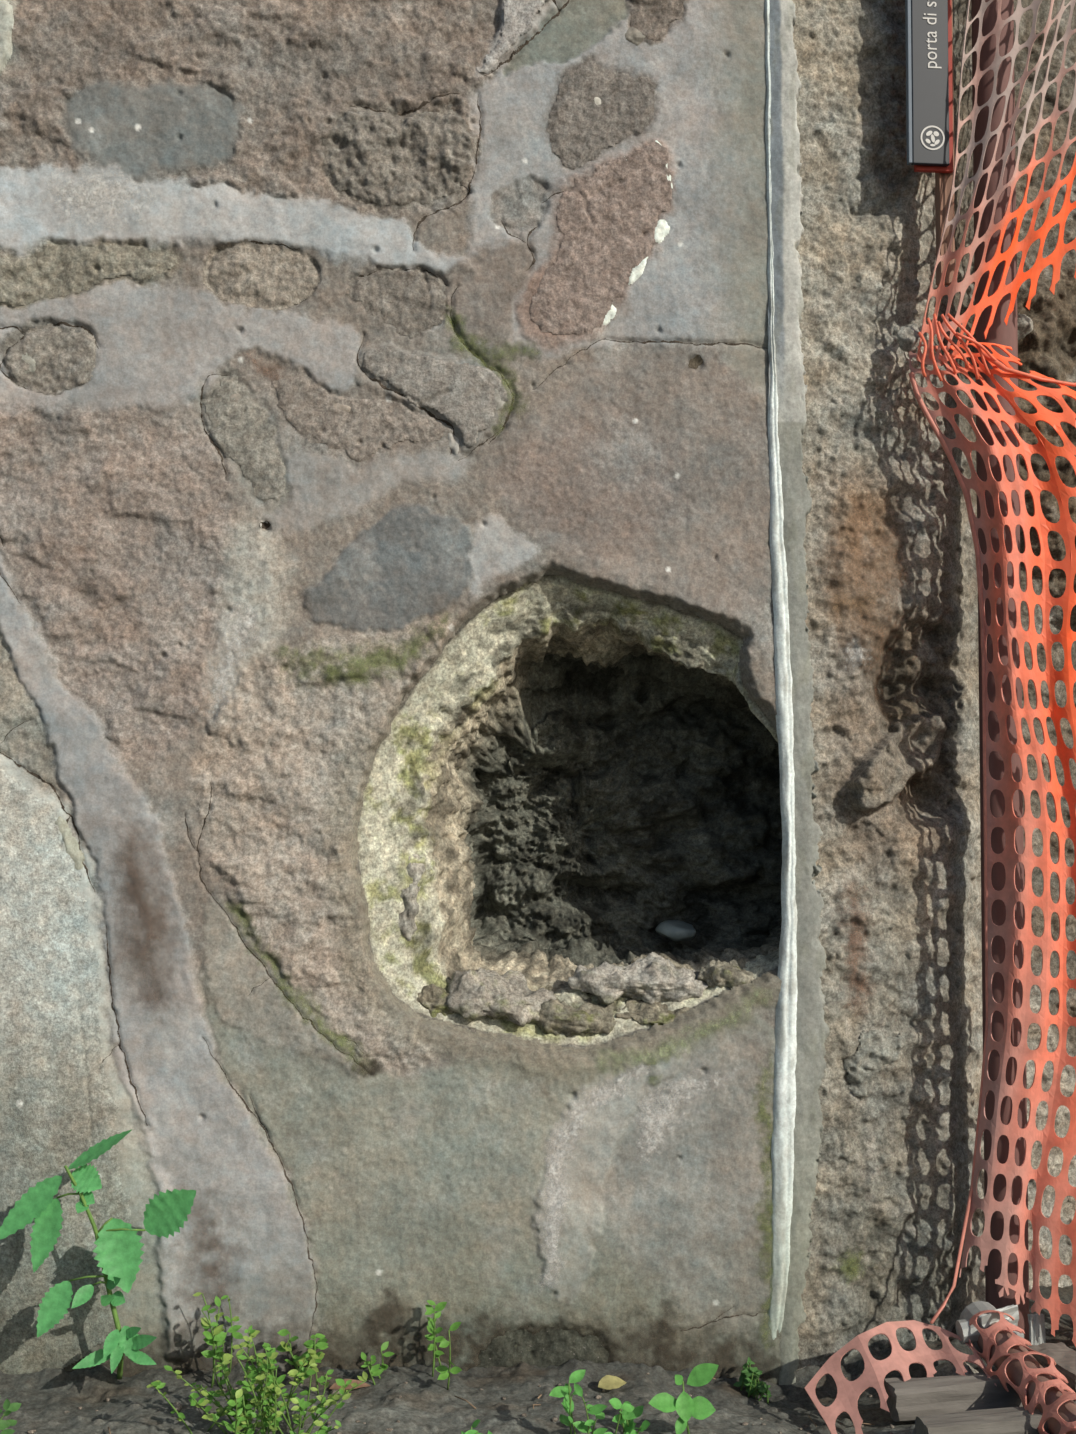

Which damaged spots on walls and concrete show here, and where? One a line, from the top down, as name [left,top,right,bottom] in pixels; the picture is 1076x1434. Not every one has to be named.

crack [205,1040,318,1350]